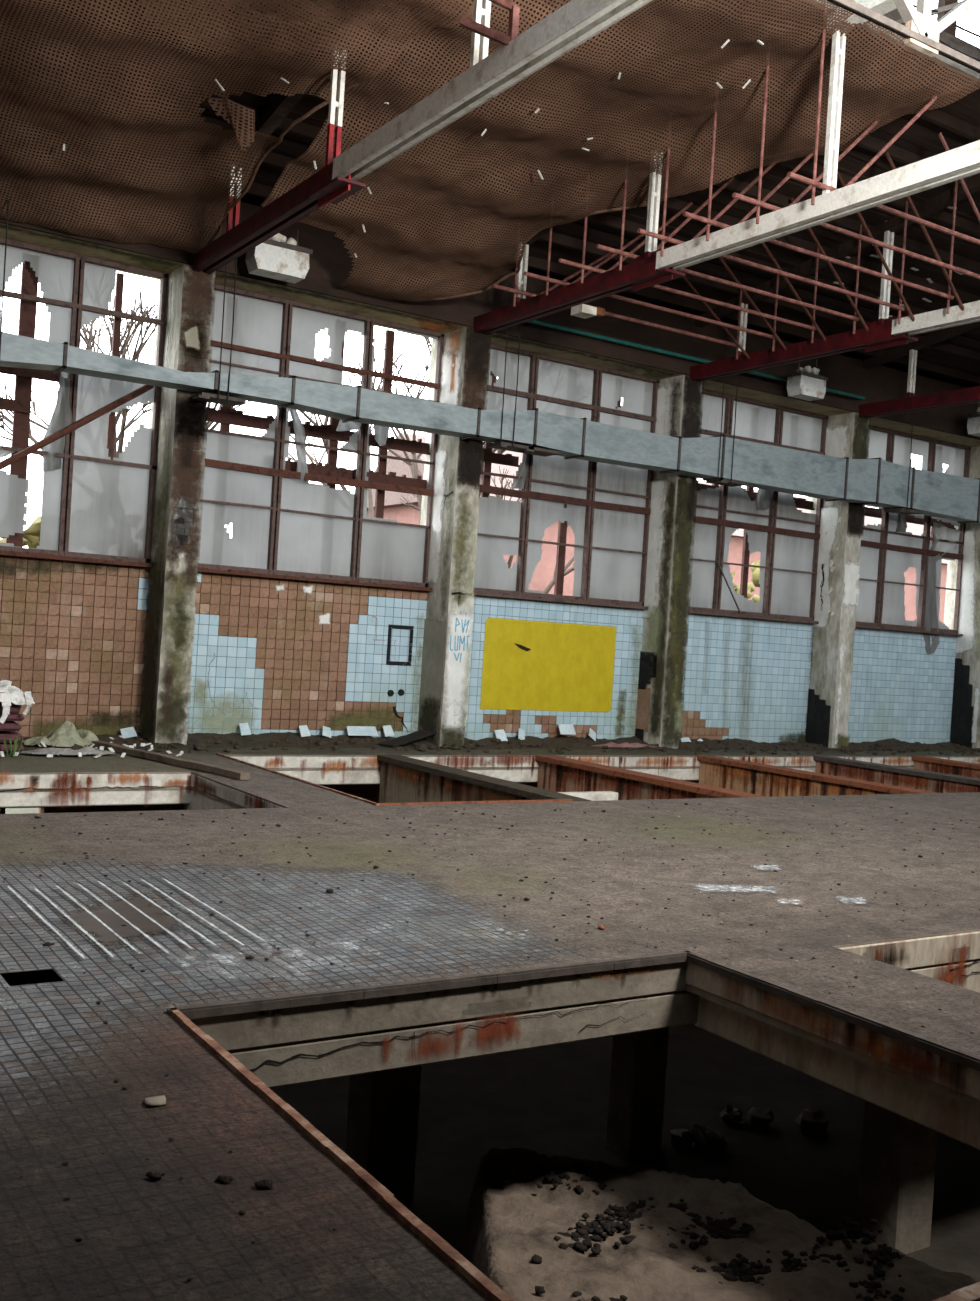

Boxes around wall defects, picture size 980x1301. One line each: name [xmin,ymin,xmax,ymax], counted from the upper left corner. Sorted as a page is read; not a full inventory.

water stain [0,225,450,373]
peeling [439,350,461,406]
water stain [462,326,705,438]
water stain [33,390,208,743]
peeling [195,450,447,732]
water stain [329,438,485,747]
peeling [950,529,980,748]
rust [49,774,91,803]
rust [323,755,696,801]
rust [713,757,980,798]
rust [938,946,966,984]
crack [250,998,647,1071]